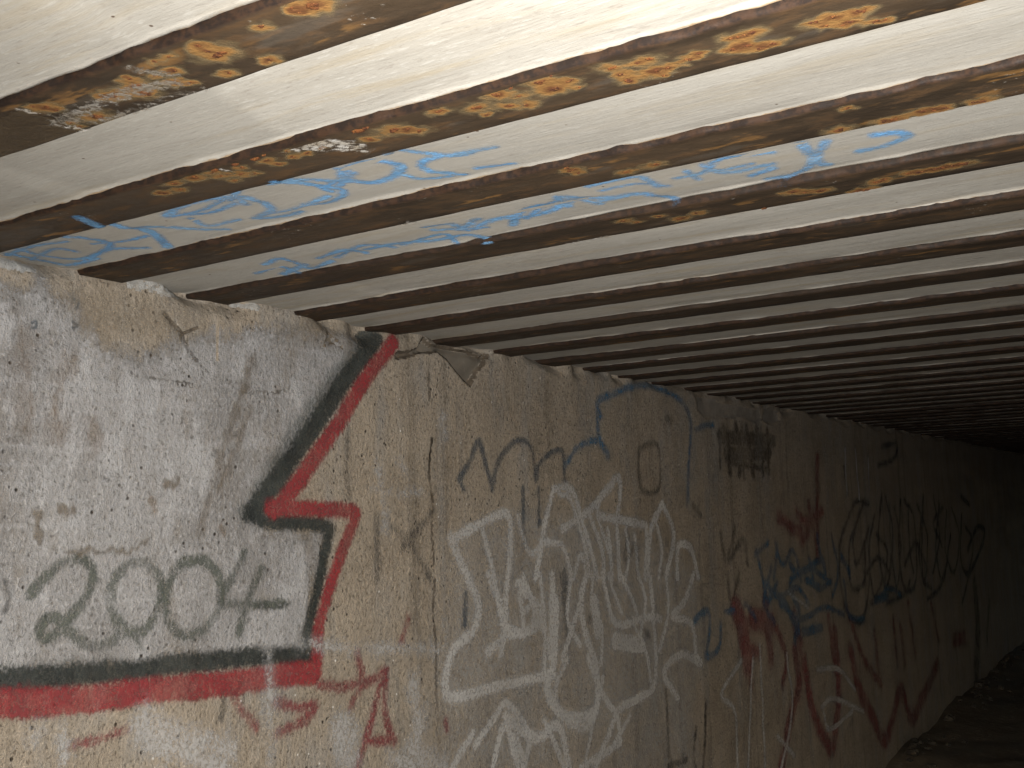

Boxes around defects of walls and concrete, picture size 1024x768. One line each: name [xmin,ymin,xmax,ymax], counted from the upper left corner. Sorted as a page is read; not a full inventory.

rust [282,0,336,17]
rust [798,5,896,29]
rust [596,27,792,85]
efflorescence [15,65,206,131]
rust [21,40,241,130]
rust [152,146,328,196]
efflorescence [287,139,369,153]
rust [351,124,429,142]
rust [425,75,585,117]
rust [870,96,1001,125]
spalling [395,336,489,387]
crack [427,437,435,502]